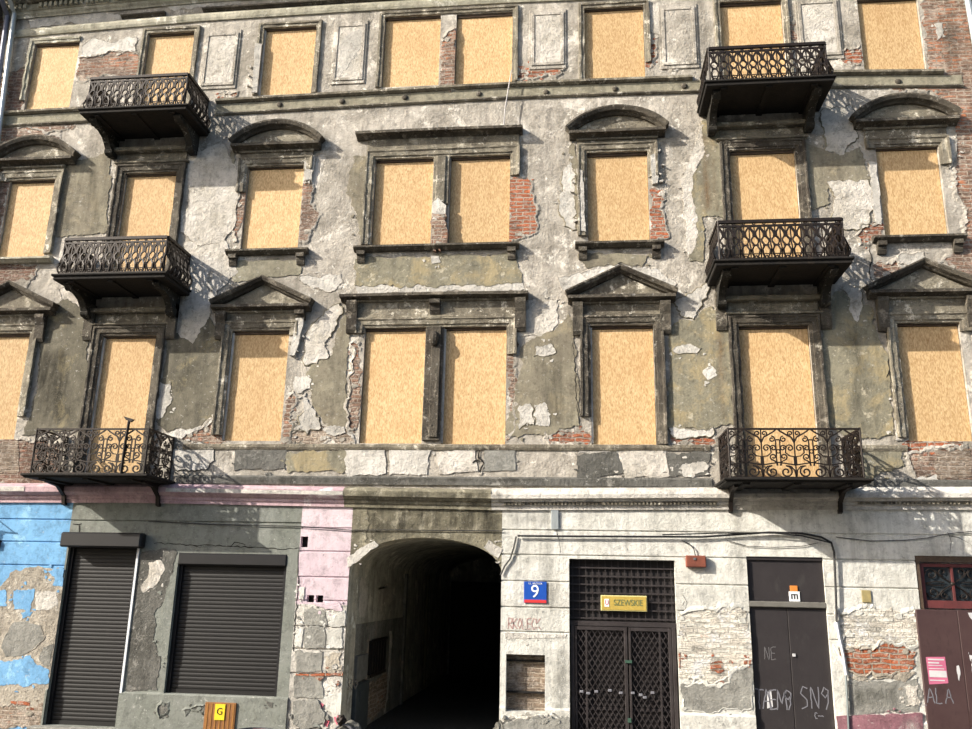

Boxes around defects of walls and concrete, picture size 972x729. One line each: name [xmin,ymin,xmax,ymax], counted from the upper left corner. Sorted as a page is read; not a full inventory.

spalling [0,63,76,144]
peeling [554,152,586,232]
peeling [649,123,709,258]
peeling [826,161,884,249]
spalling [873,0,972,280]
spalling [232,264,719,478]
spalling [0,435,64,483]
peeling [162,403,226,472]
peeling [0,564,65,729]
peeling [288,584,346,729]
spalling [677,601,754,715]
spalling [833,603,923,729]